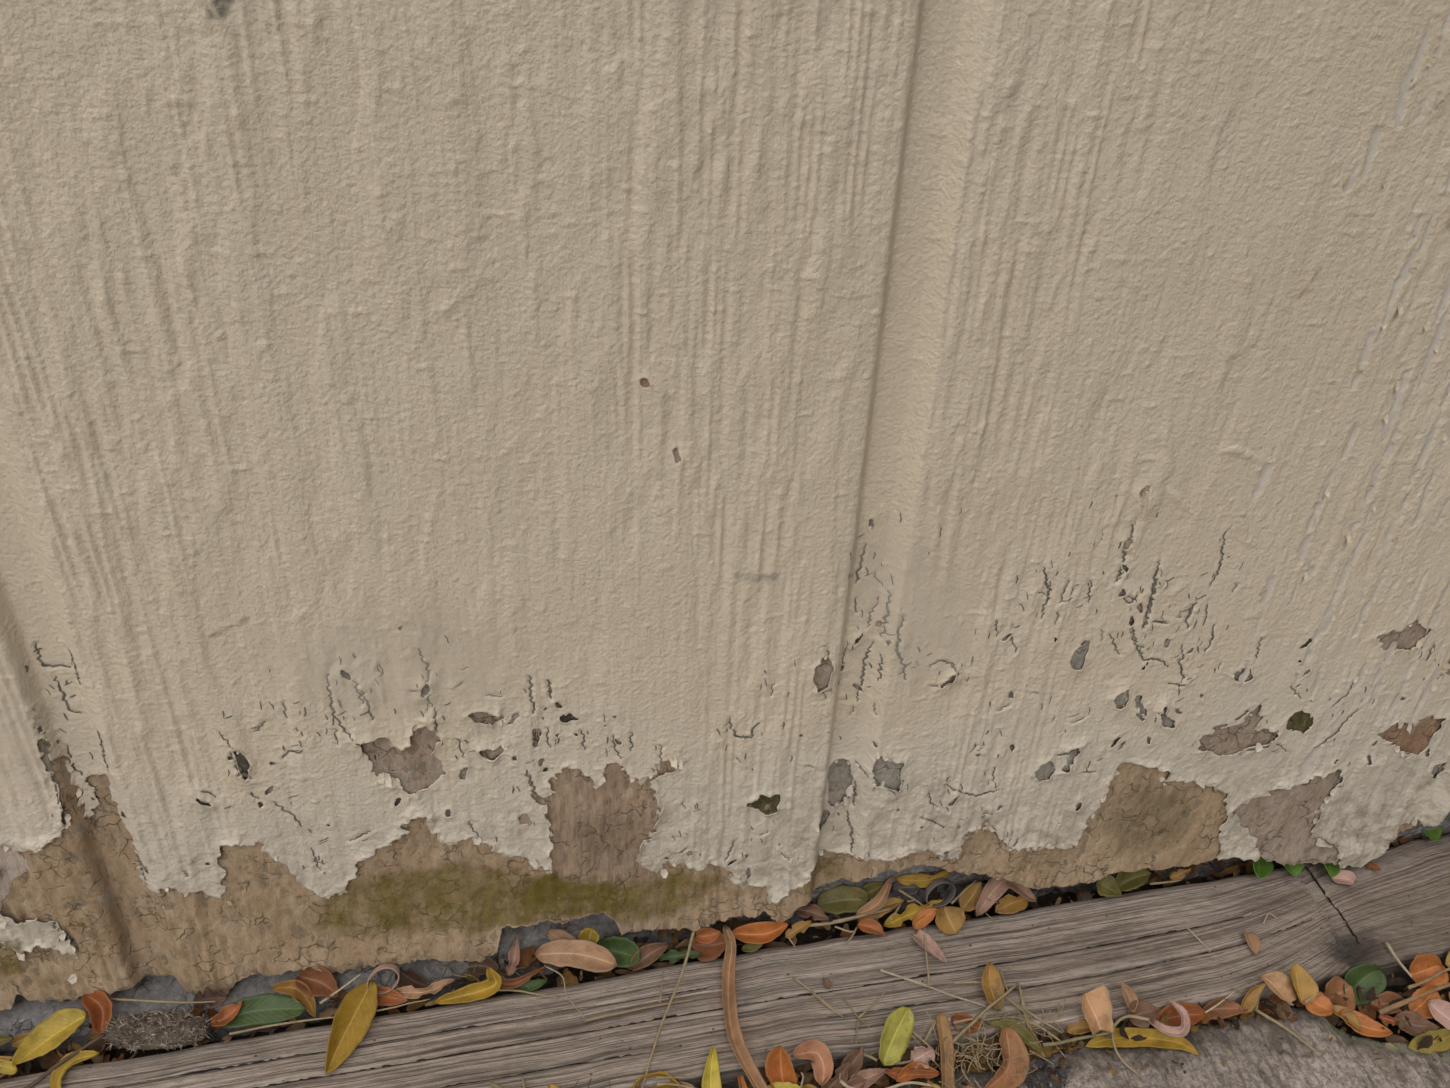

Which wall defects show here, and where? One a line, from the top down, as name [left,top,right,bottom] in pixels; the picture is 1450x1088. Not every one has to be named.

peeling [1372,571,1450,655]
peeling [813,646,844,690]
crack [716,495,1262,857]
peeling [1070,640,1089,669]
peeling [1114,690,1182,744]
peeling [1367,714,1447,778]
peeling [0,702,1343,1011]